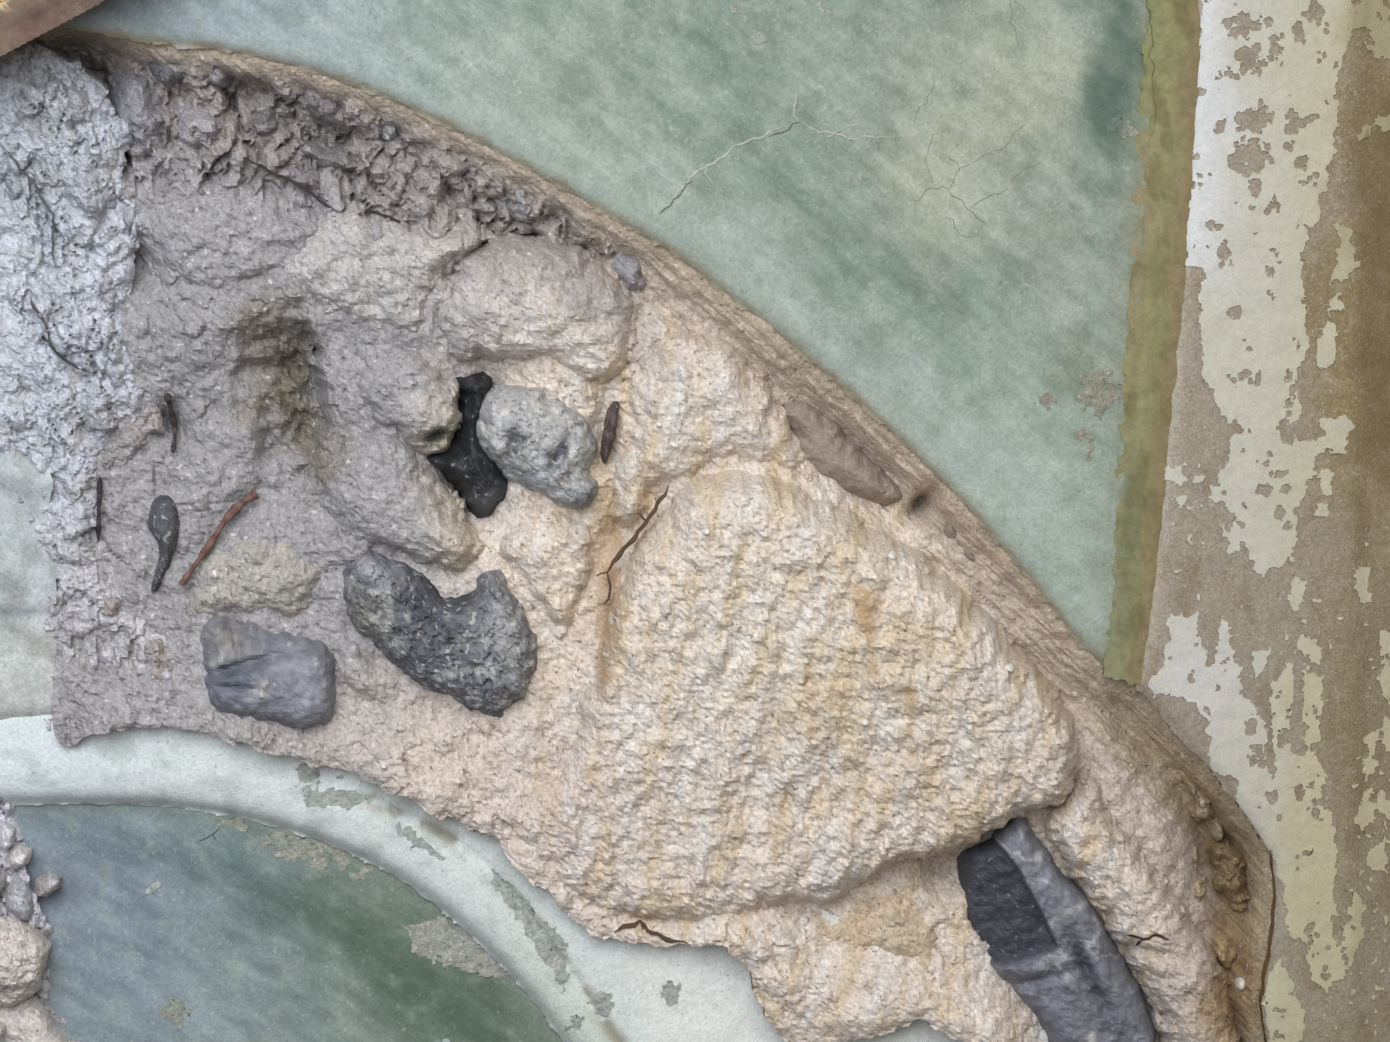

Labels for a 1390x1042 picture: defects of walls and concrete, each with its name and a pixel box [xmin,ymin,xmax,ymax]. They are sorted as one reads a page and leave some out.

spalling [175,100,221,148]
spalling [296,138,360,172]
spalling [0,42,174,682]
peeling [1165,0,1390,627]
spalling [783,400,903,506]
crack [596,484,669,605]
peeling [300,779,369,810]
peeling [1148,612,1367,994]
peeling [1352,716,1390,891]
peeling [403,916,513,980]
peeling [491,869,570,993]
peeling [1260,958,1305,1042]